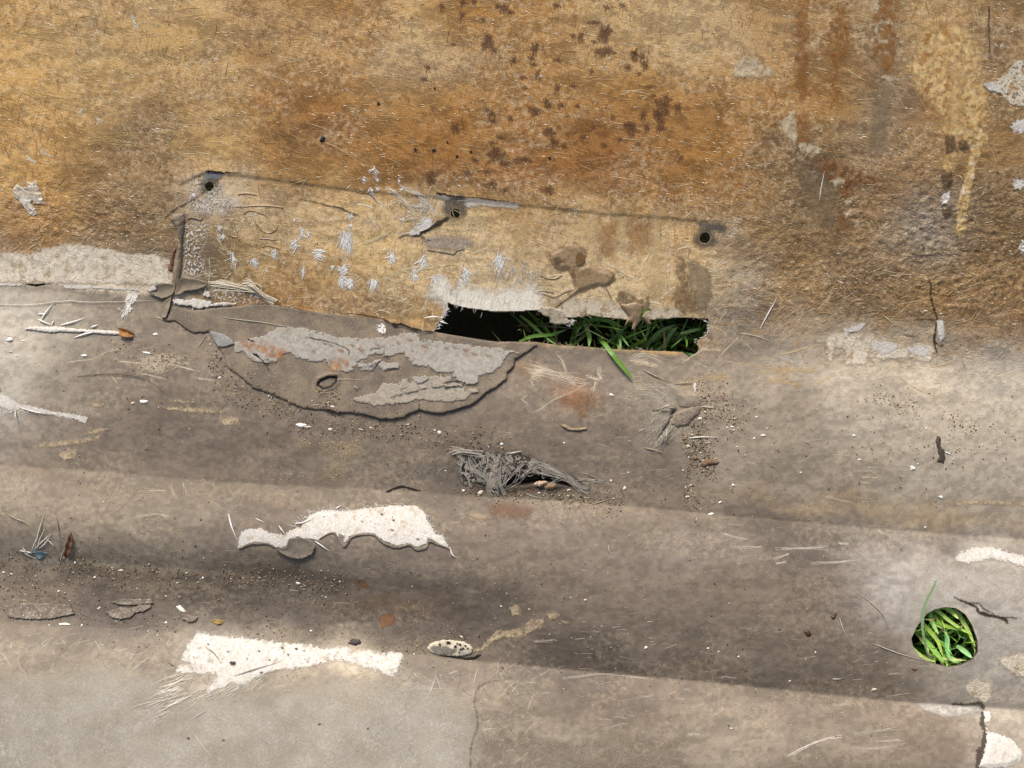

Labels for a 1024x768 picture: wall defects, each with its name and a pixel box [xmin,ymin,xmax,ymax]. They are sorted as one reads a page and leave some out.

corrosion [480,18,499,55]
corrosion [456,108,532,193]
corrosion [509,42,540,90]
corrosion [527,83,580,117]
corrosion [571,20,616,57]
corrosion [601,51,683,147]
water stain [881,22,989,236]
spalling [642,305,683,319]
peeling [163,288,537,431]
spalling [445,441,626,499]
crack [469,681,490,767]
crack [952,701,987,768]